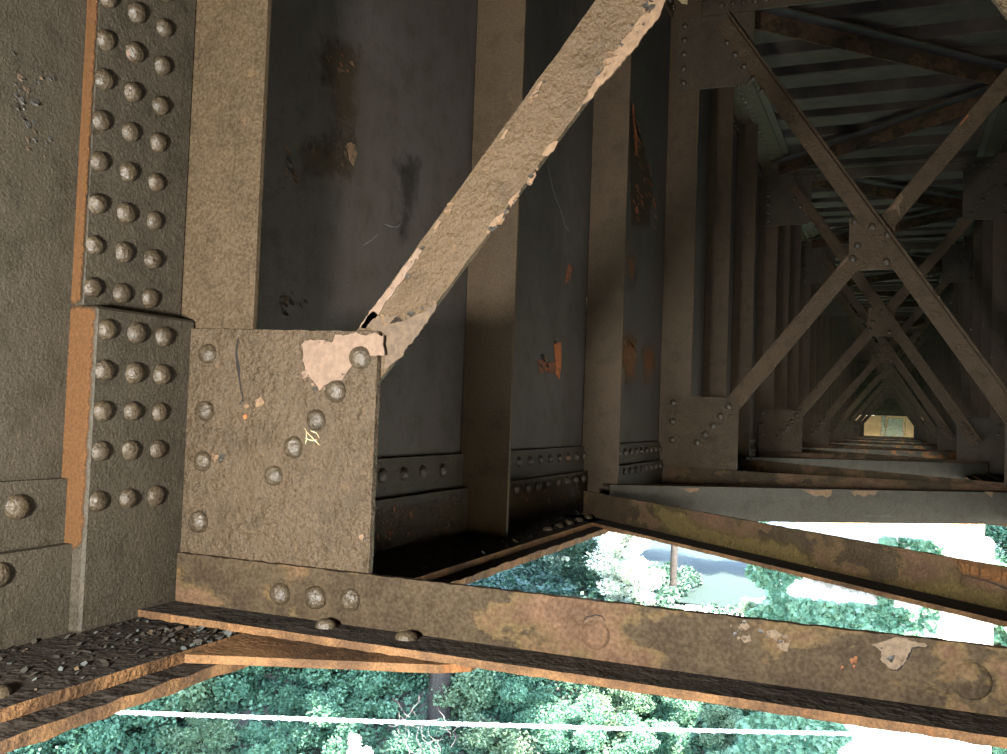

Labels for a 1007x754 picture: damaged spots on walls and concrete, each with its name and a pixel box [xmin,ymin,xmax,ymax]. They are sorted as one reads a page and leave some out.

peeling [577,0,666,113]
peeling [528,80,546,104]
peeling [542,141,559,157]
corrosion [630,103,657,227]
peeling [434,203,454,233]
peeling [486,168,538,234]
peeling [301,246,437,391]
corrosion [538,340,562,379]
corrosion [622,336,655,383]
peeling [872,636,929,671]